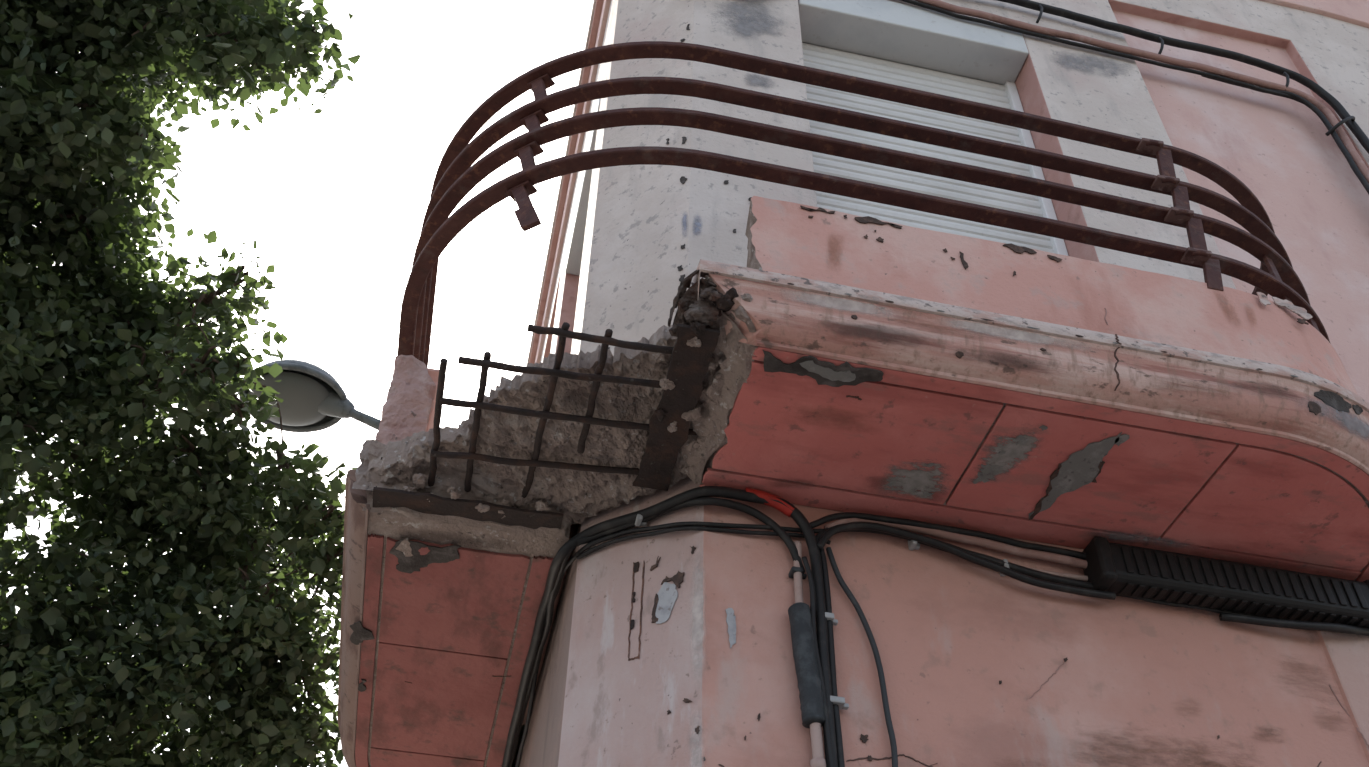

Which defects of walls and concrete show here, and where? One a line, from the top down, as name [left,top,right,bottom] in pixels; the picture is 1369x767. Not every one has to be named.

crack [1104,308,1122,391]
spalling [352,244,884,574]
spalling [1308,390,1363,415]
peeling [883,462,947,499]
peeling [972,425,1048,484]
peeling [1029,432,1130,520]
peeling [650,556,703,646]